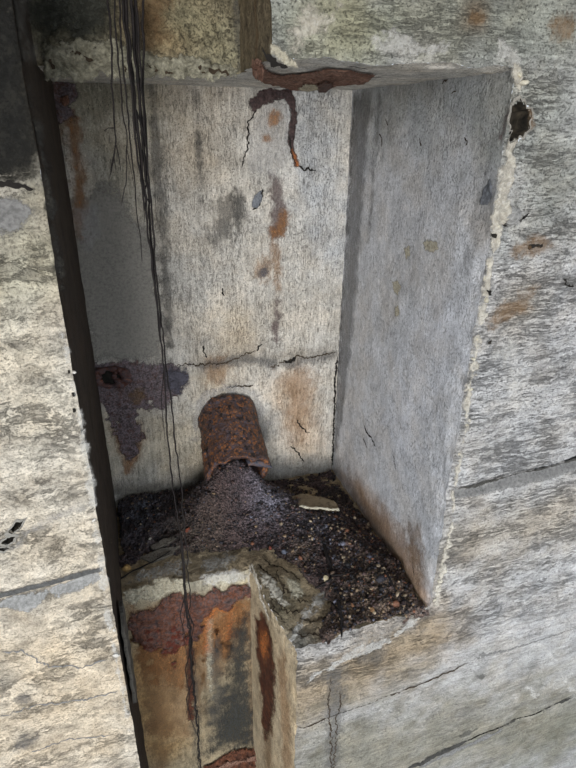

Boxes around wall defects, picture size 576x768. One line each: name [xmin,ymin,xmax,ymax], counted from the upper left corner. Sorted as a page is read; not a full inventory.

corrosion [251,58,375,93]
corrosion [52,81,86,225]
corrosion [269,176,287,238]
spalling [479,64,534,325]
crack [177,344,262,367]
crack [270,352,338,465]
spalling [451,335,492,513]
spalling [247,565,269,620]
spalling [433,523,454,607]
corrosion [127,585,277,741]
crack [299,629,573,768]